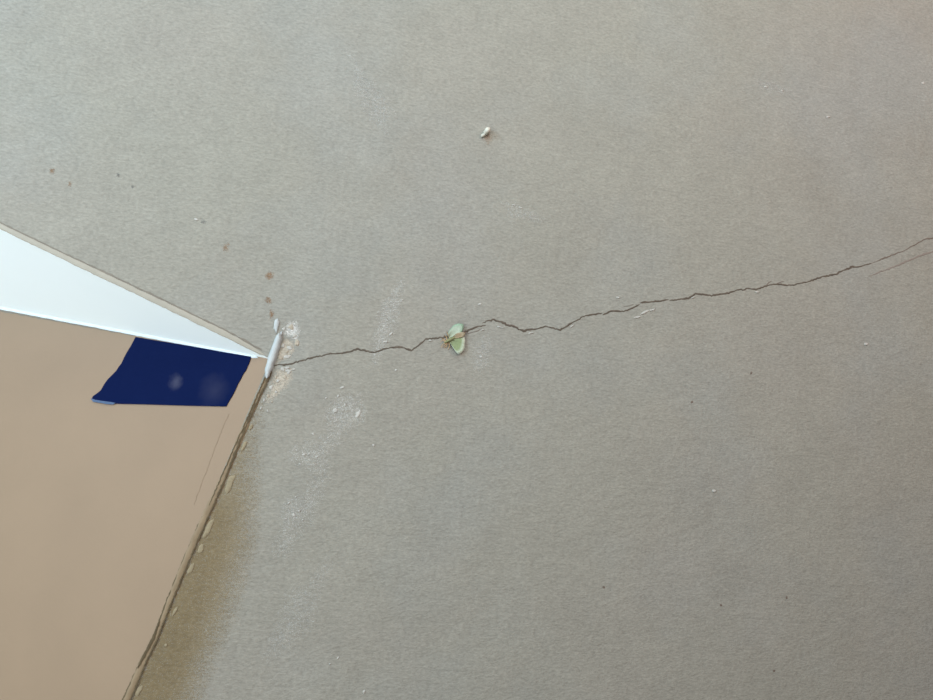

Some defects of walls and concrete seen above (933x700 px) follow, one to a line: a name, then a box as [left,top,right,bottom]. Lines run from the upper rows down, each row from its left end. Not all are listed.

crack [122,238,933,700]